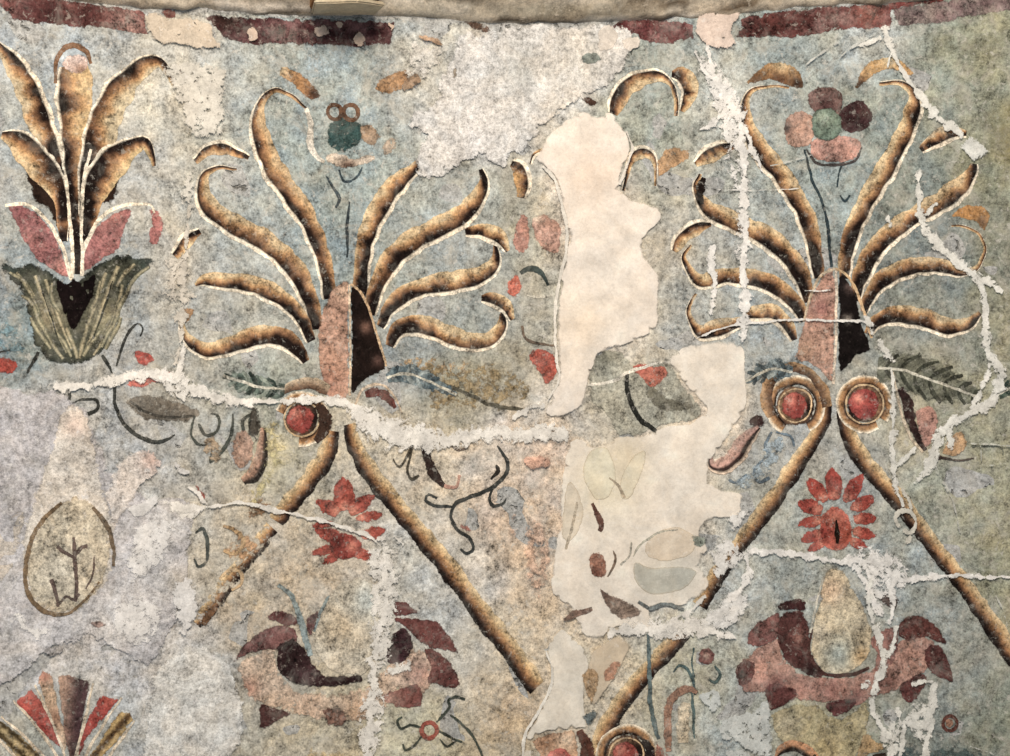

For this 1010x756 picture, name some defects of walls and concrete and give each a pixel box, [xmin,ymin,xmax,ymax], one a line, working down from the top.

crack [162,486,411,756]
crack [53,205,570,454]
flaking render [402,23,661,416]
flaking render [510,342,748,756]
crack [607,45,1010,756]
crack [857,25,964,139]